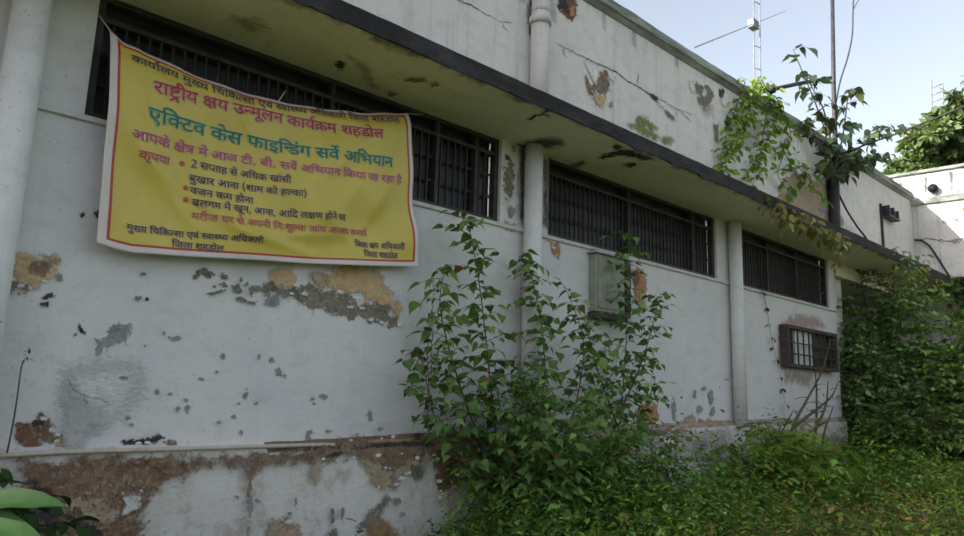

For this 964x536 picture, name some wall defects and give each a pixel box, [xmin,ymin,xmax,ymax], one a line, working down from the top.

spalling [557,0,579,22]
spalling [584,60,617,109]
crack [557,43,691,120]
spalling [689,80,715,110]
peeling [10,251,63,307]
peeling [193,264,402,329]
peeling [74,323,132,356]
flaking render [15,412,212,536]
spalling [266,498,303,536]
peeling [324,506,345,536]